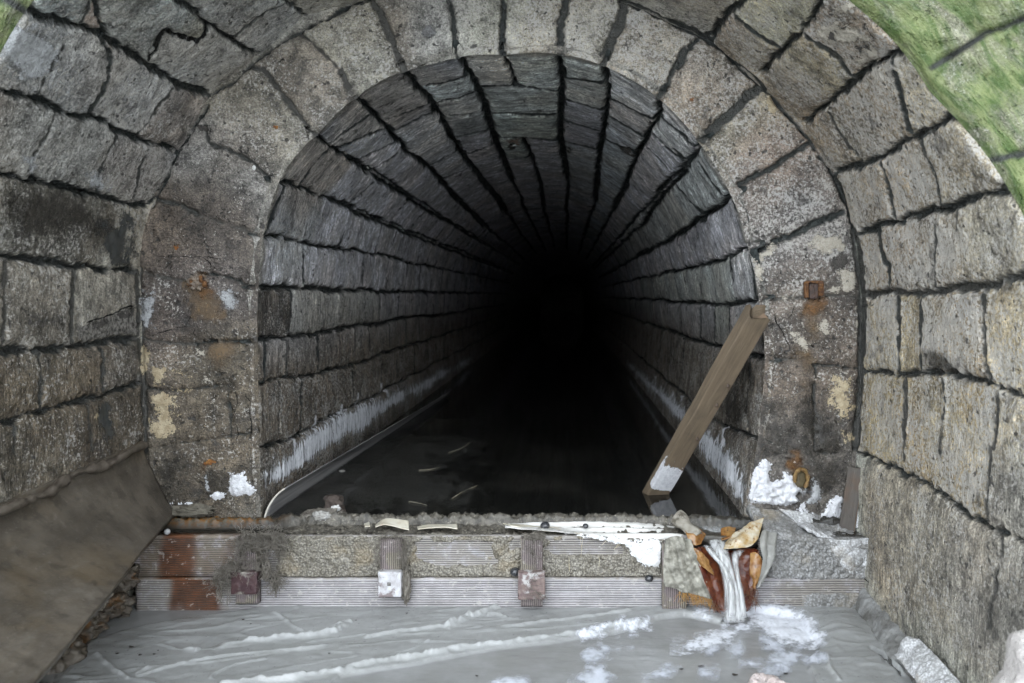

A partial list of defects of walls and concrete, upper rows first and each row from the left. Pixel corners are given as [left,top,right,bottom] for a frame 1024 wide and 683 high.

rust [209,343,234,360]
leakage [201,358,472,501]
efflorescence [627,360,686,422]
leakage [699,361,869,574]